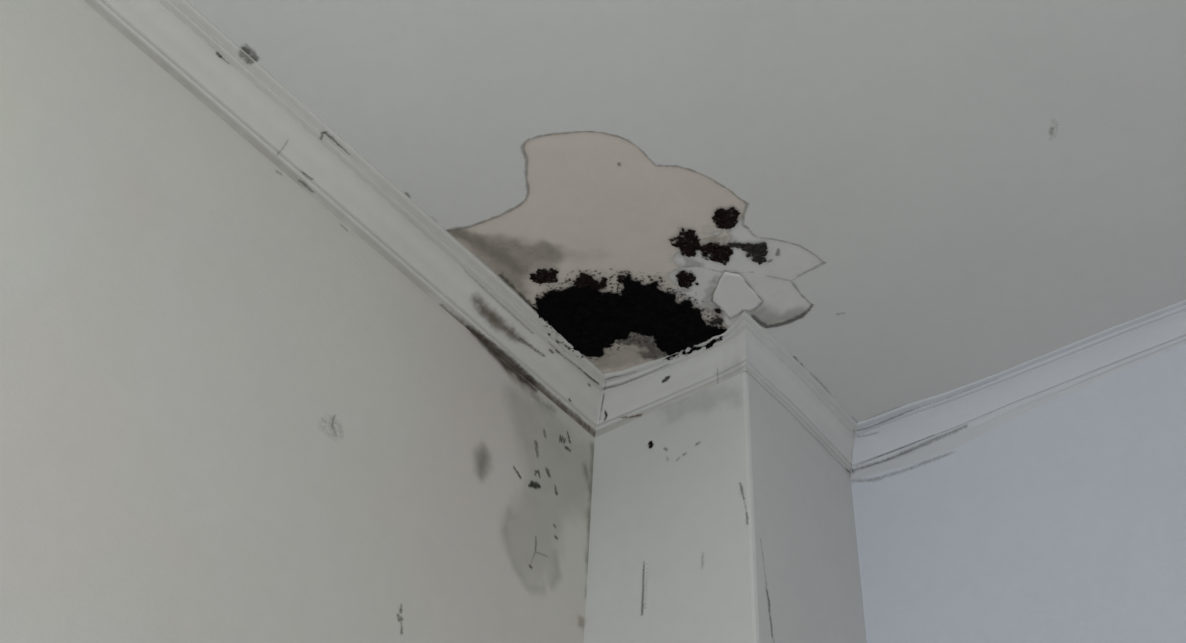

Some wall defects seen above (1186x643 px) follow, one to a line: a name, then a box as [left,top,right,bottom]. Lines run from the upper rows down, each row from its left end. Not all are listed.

peeling [447,131,822,329]
damp [712,207,741,229]
damp [446,310,595,435]
peeling [586,332,660,373]
damp [476,228,778,360]